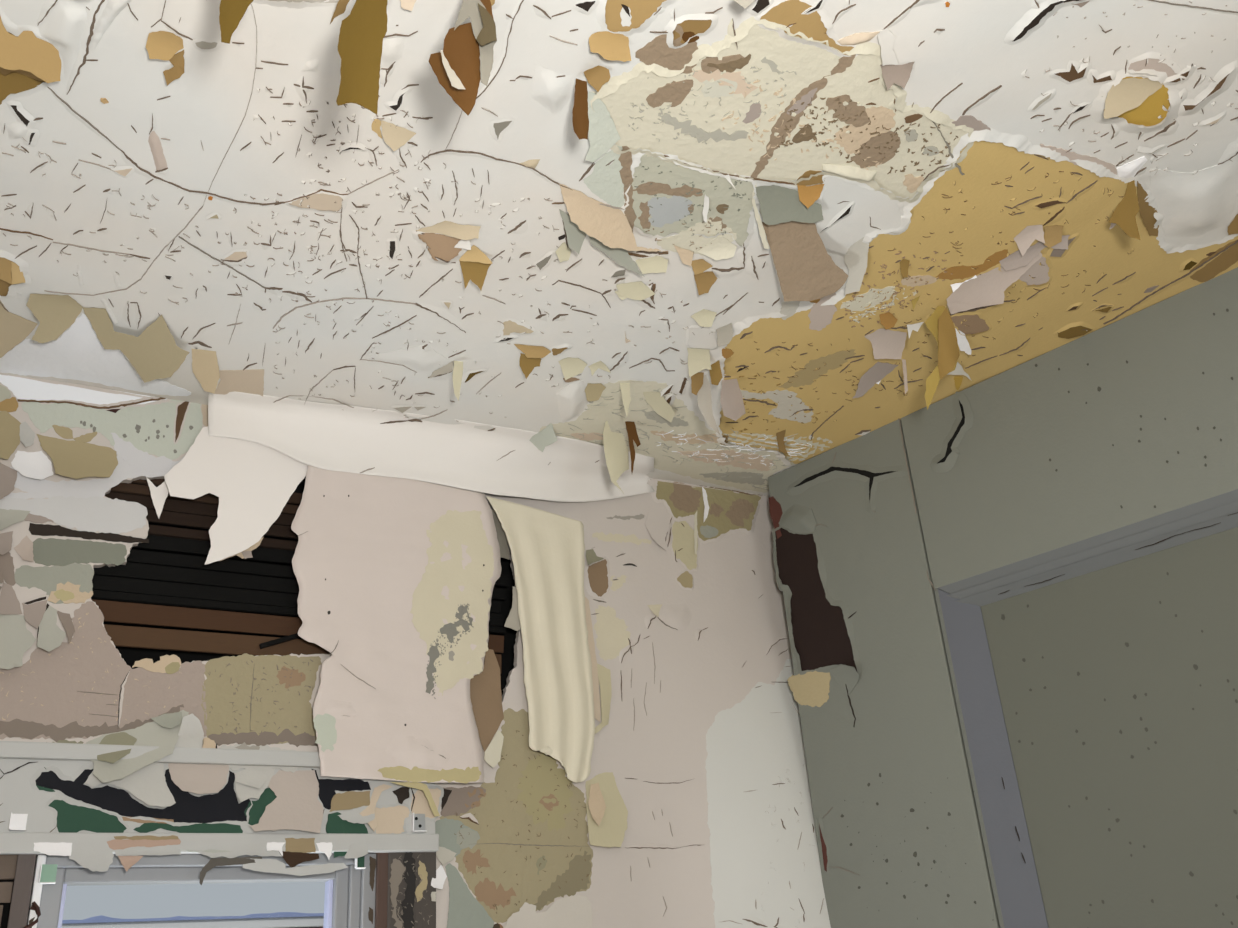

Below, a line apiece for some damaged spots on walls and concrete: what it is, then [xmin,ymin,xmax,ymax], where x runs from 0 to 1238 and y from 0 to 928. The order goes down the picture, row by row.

peeling [253,0,350,24]
peeling [0,7,65,110]
peeling [146,31,221,86]
peeling [371,119,416,151]
peeling [283,191,348,214]
peeling [411,221,493,290]
crack [0,0,1238,516]
peeling [429,361,454,378]
peeling [498,0,1238,707]
flaking render [0,250,322,751]
flaking render [34,708,628,928]